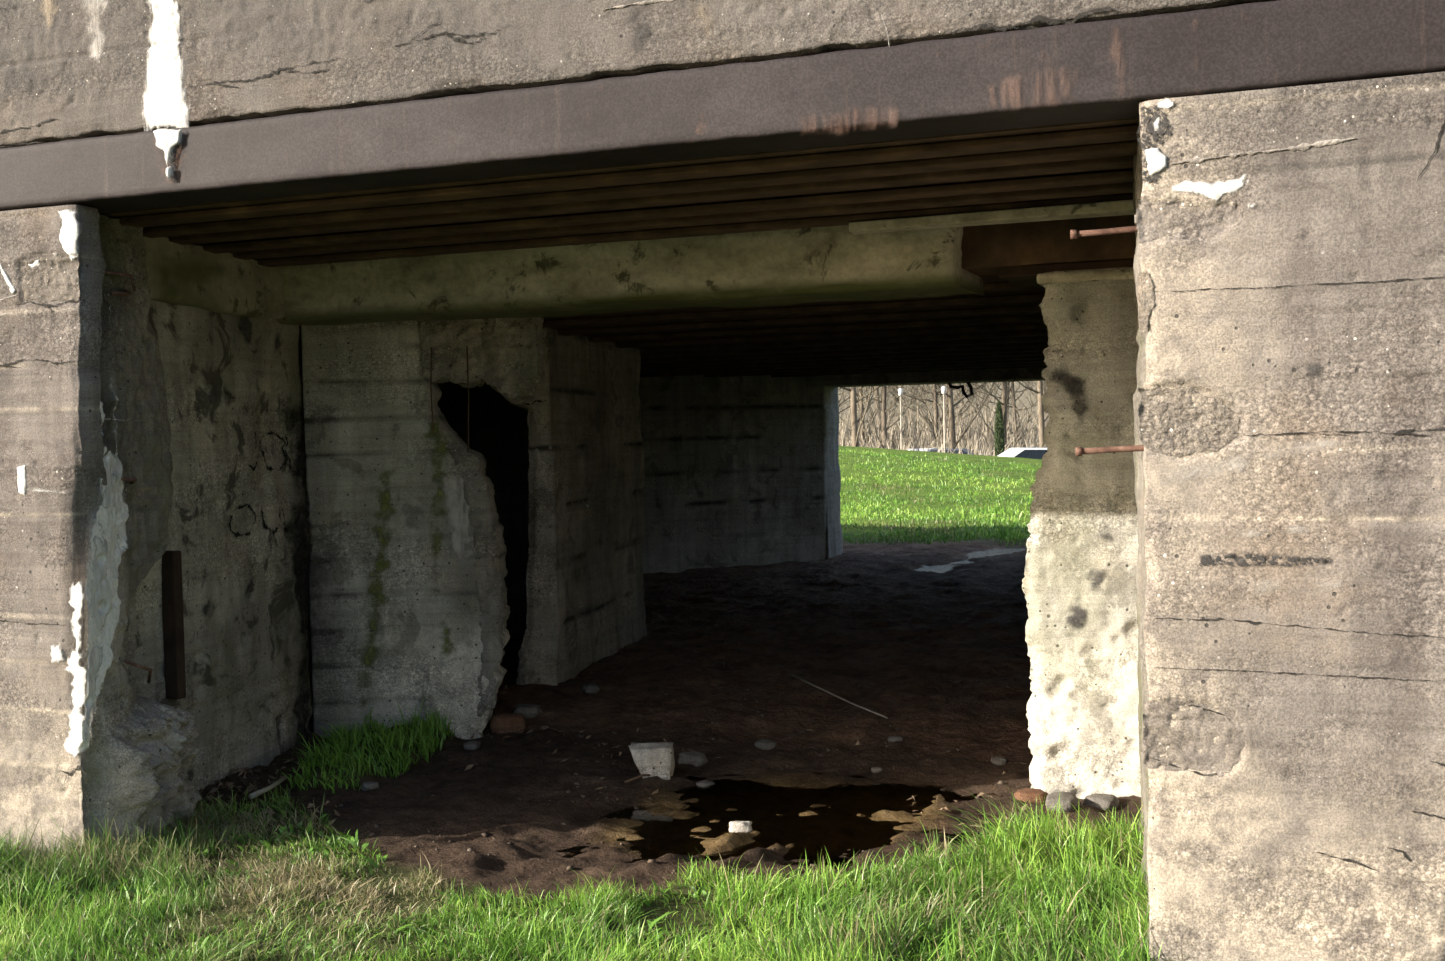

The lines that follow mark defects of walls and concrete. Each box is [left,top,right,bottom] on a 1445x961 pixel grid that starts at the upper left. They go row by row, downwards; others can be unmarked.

leakage [88,0,107,56]
crack [396,21,508,47]
leakage [143,0,187,180]
spalling [1070,99,1255,243]
crack [1418,119,1445,178]
spalling [443,442,503,717]
crack [1412,811,1445,820]
crack [1314,848,1411,872]